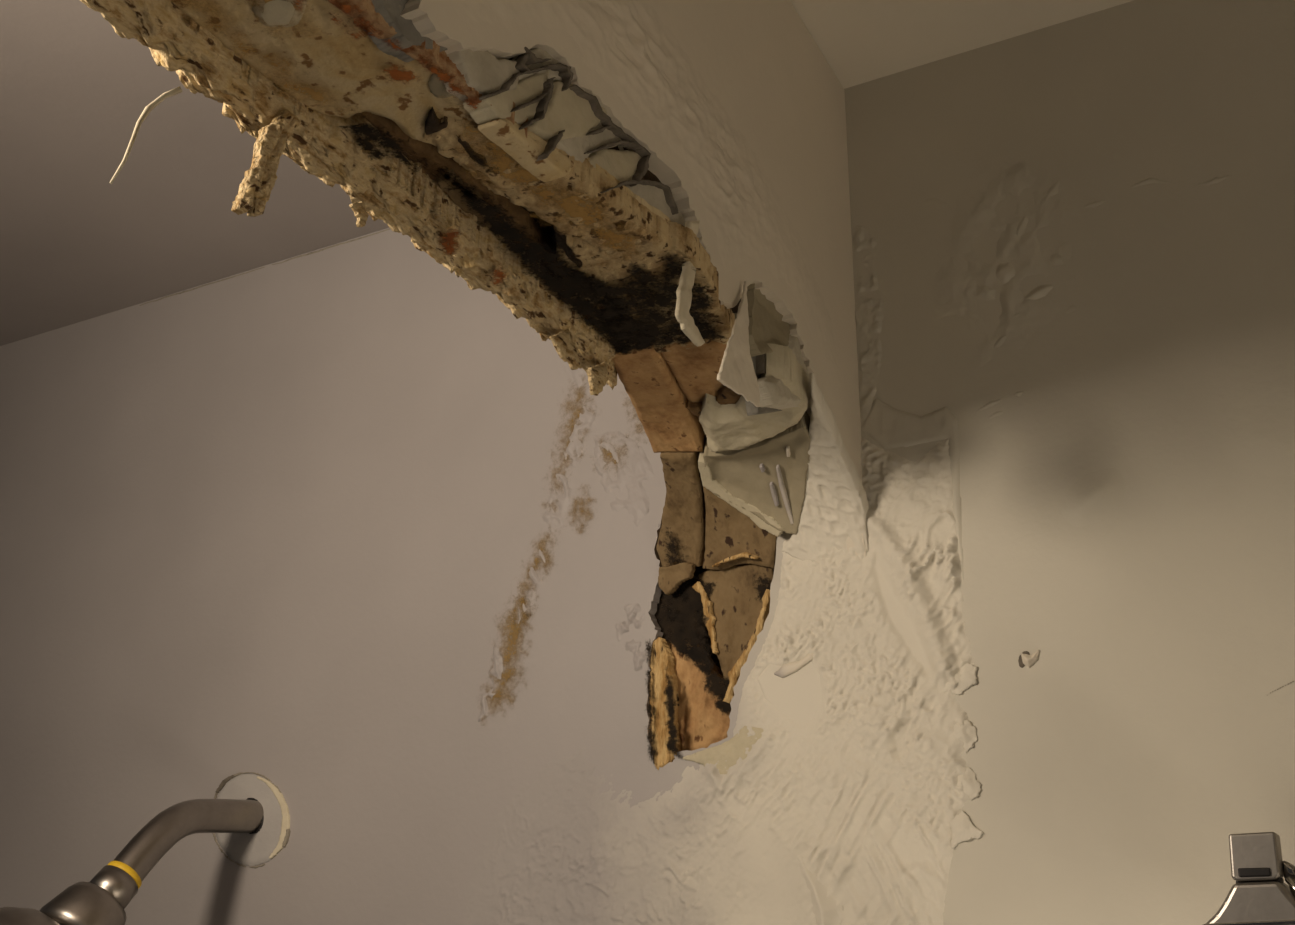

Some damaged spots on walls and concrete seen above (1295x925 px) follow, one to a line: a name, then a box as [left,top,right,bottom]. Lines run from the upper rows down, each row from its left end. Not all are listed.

rust [330,0,478,109]
flaking render [80,0,811,537]
rust [440,229,461,255]
leakage [182,0,727,355]
leakage [490,536,550,707]
peeling [774,653,813,678]